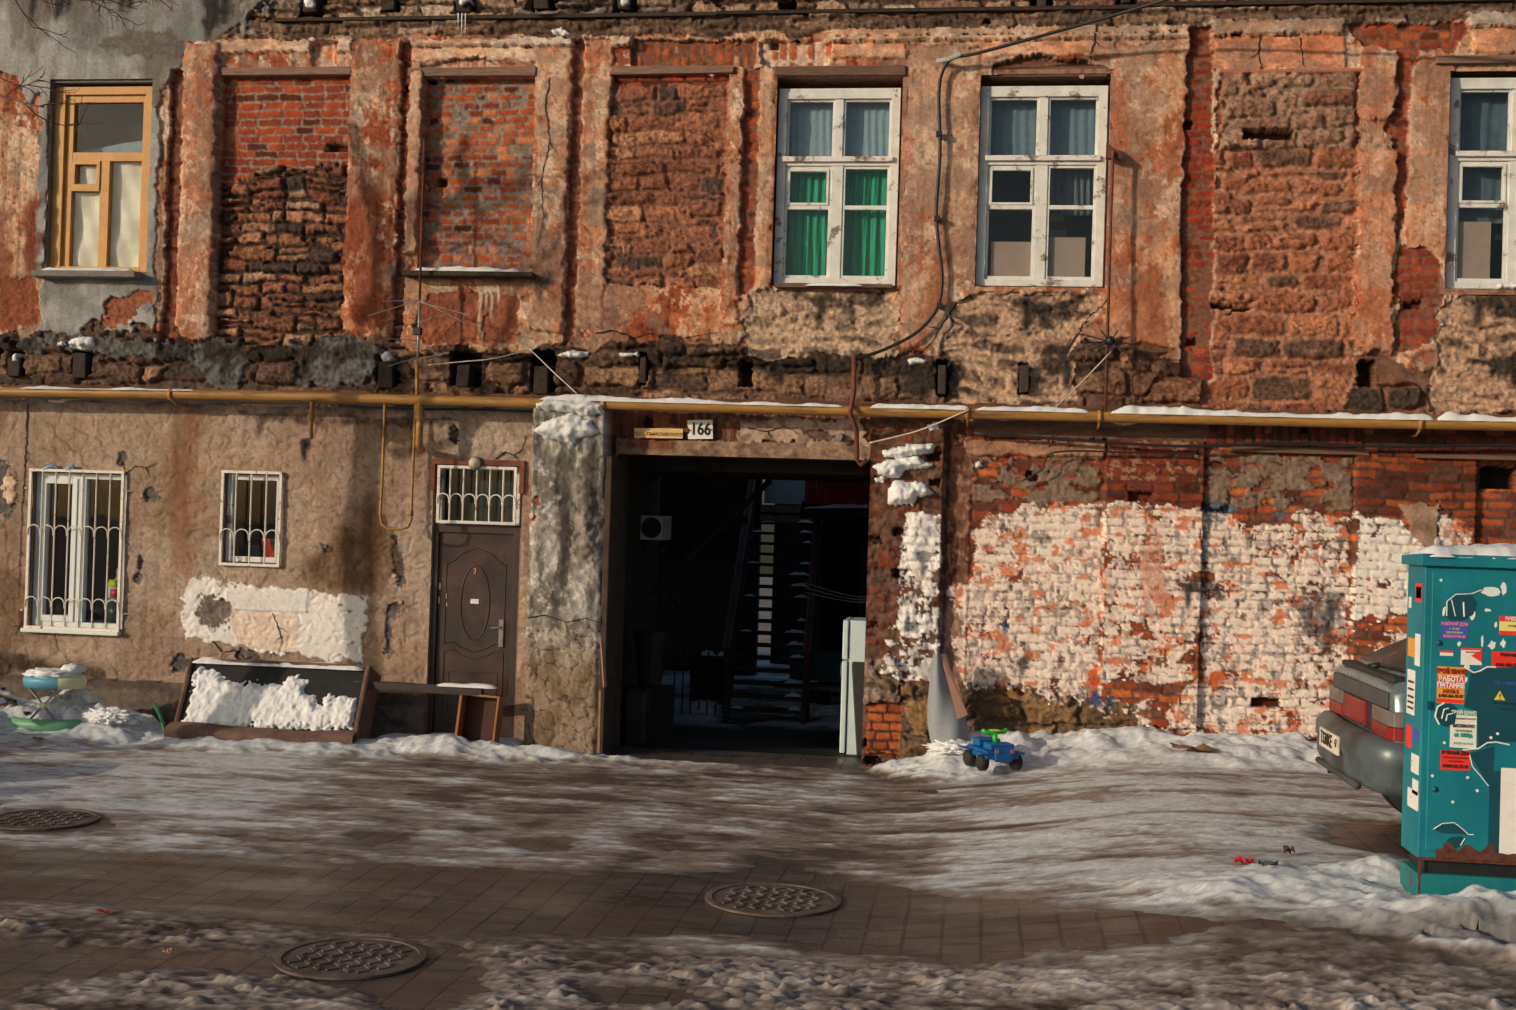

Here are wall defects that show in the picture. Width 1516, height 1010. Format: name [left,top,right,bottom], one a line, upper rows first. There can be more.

spalling [702,0,741,11]
spalling [780,0,796,10]
spalling [100,70,184,348]
spalling [0,276,40,334]
spalling [940,289,1102,407]
spalling [0,460,17,520]
damp [307,493,401,590]
peeling [879,499,1474,740]